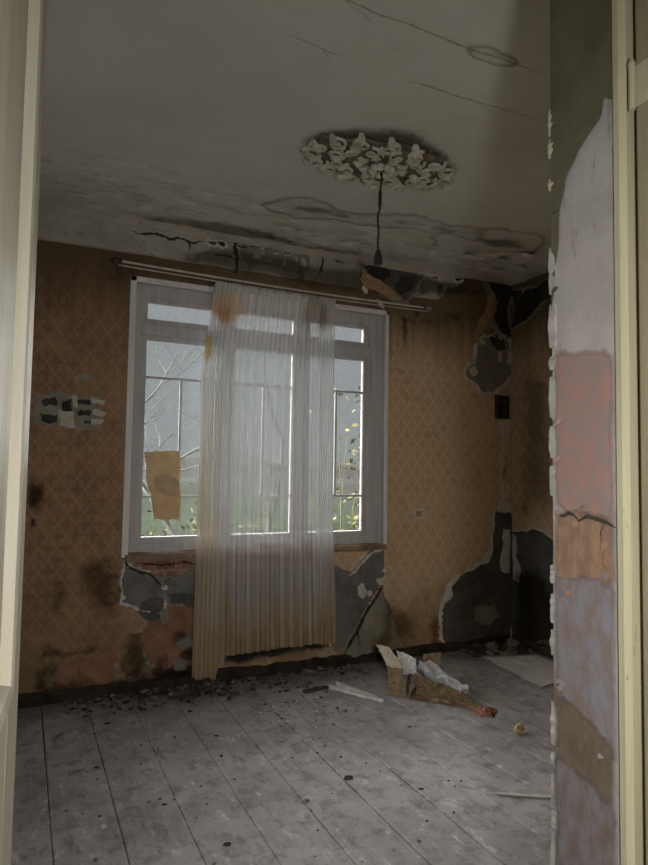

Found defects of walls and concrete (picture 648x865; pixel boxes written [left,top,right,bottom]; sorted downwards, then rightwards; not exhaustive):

crack [344,0,546,75]
crack [405,80,544,123]
crack [133,231,203,253]
crack [222,242,254,274]
damp [150,219,357,254]
damp [189,252,365,289]
damp [419,278,478,295]
peeling [58,395,78,428]
peeling [91,397,107,425]
peeling [438,0,615,865]
flaking render [118,549,387,672]
damp [131,645,192,681]